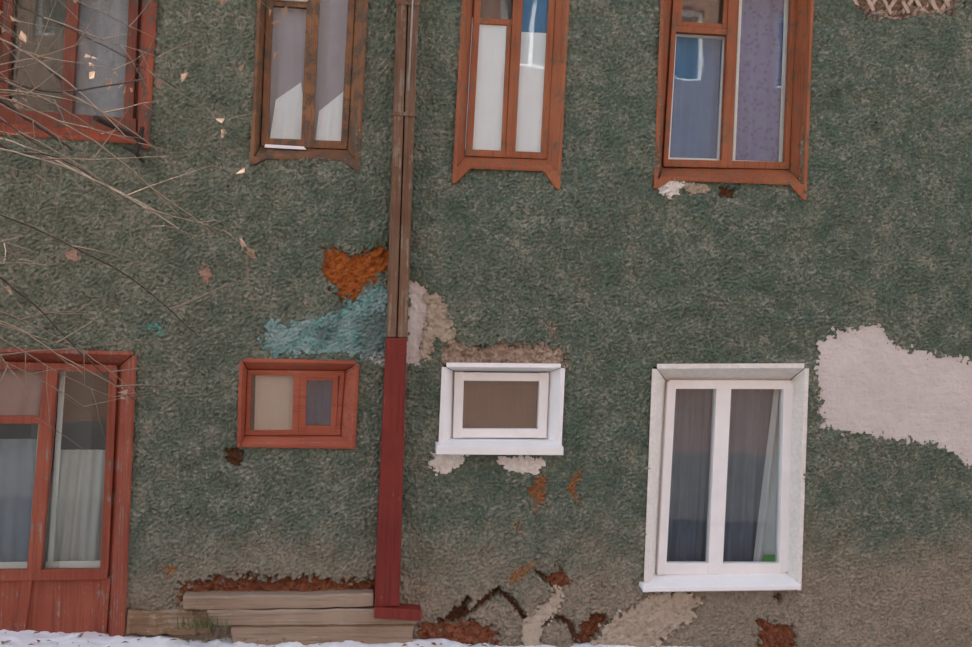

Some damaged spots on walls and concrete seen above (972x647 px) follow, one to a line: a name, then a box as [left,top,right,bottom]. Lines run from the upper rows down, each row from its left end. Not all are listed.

peeling [257,243,389,366]
spalling [406,280,571,372]
flaking render [813,322,972,469]
spalling [158,565,375,603]
spalling [544,564,573,590]
flaking render [417,596,500,645]
crack [463,585,582,644]